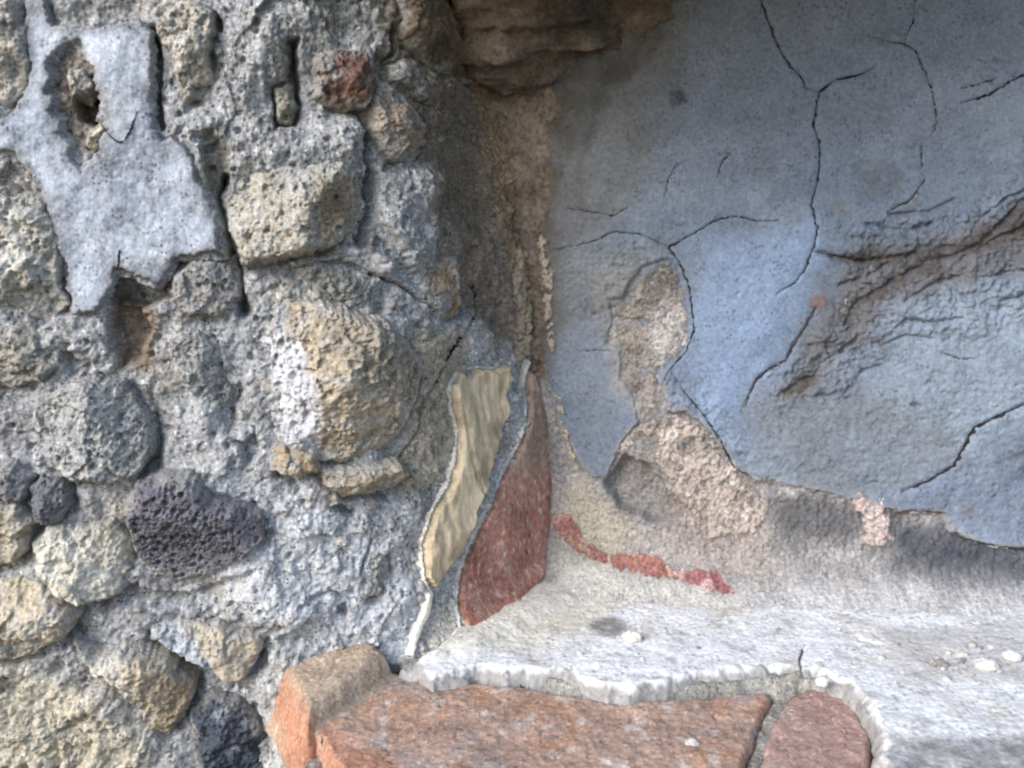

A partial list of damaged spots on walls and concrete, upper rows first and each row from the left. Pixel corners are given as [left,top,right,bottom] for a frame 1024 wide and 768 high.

crack [761,2,898,293]
crack [863,0,938,210]
crack [961,75,1024,103]
flaking render [413,245,736,628]
crack [561,208,779,477]
spalling [610,261,768,541]
crack [745,308,816,406]
spalling [849,492,894,547]
crack [892,405,1024,551]